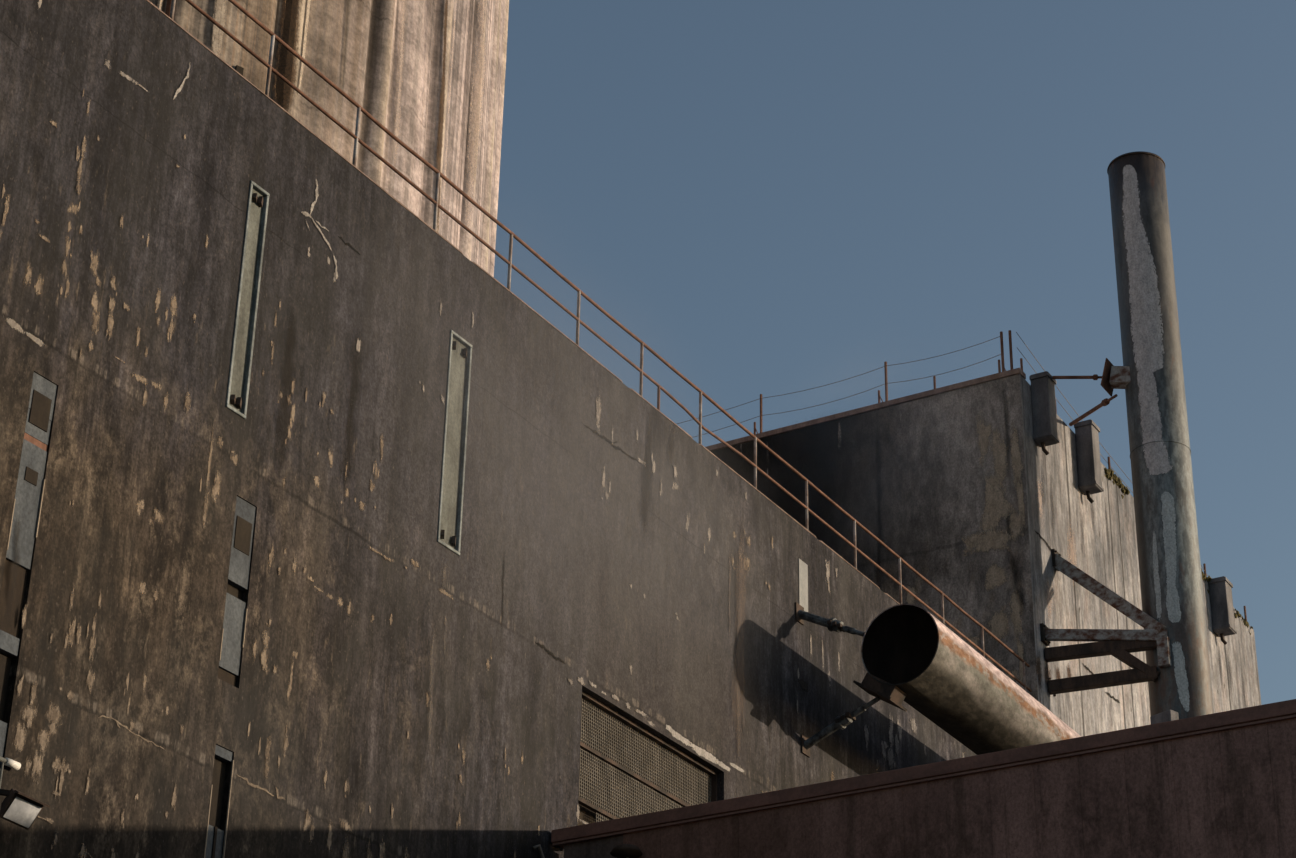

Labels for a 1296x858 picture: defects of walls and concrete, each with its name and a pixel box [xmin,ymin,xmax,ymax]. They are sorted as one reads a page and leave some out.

crack [301,179,360,279]
spalling [6,318,44,347]
peeling [1122,165,1173,475]
peeling [278,380,334,445]
peeling [200,432,238,525]
peeling [269,544,351,614]
peeling [1152,491,1181,623]
peeling [12,676,74,797]
peeling [51,586,101,692]
peeling [253,619,298,697]
spalling [568,677,744,772]
peeling [1172,642,1190,712]